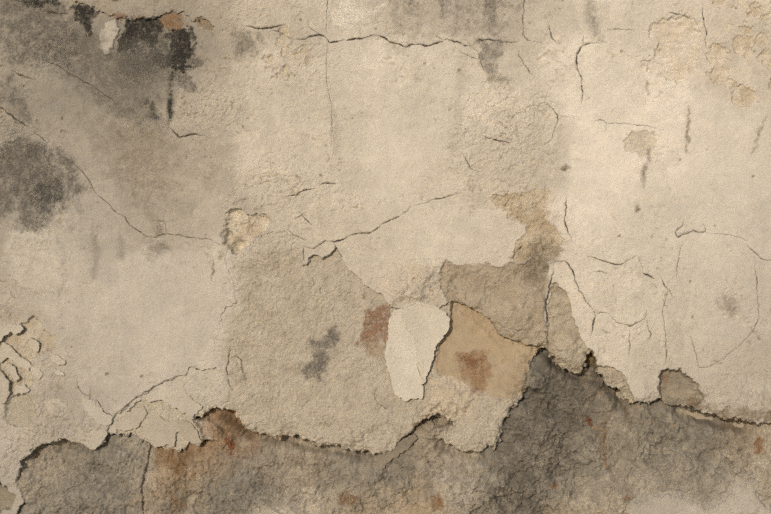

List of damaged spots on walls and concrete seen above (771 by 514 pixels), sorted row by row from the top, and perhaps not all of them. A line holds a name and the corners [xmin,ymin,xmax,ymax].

crack [301,0,528,47]
spalling [640,0,771,109]
damp [0,143,81,227]
crack [294,215,396,255]
rust [356,305,389,343]
spalling [0,184,771,514]
crack [545,262,595,331]